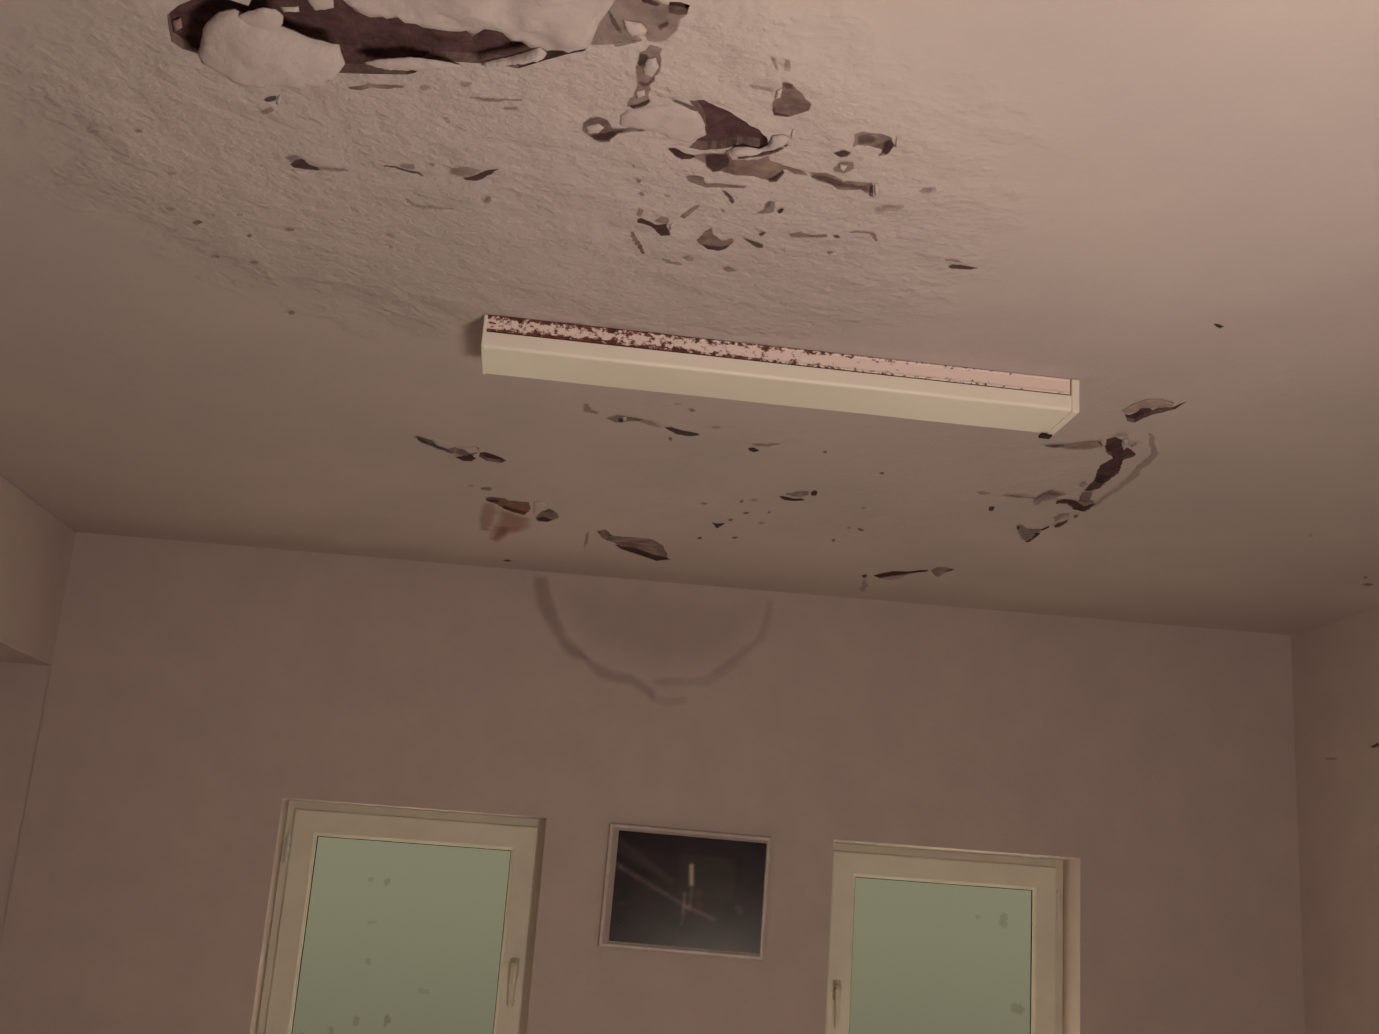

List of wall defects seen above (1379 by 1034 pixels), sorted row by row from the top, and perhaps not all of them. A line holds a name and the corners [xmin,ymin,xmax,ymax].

spalling [167,0,614,104]
spalling [583,0,899,203]
spalling [290,159,320,175]
spalling [464,169,498,181]
peeling [637,206,700,236]
peeling [697,228,765,251]
spalling [1122,399,1186,423]
peeling [415,436,506,463]
spalling [989,437,1136,542]
peeling [486,497,558,522]
peeling [598,530,670,561]
peeling [862,567,952,580]